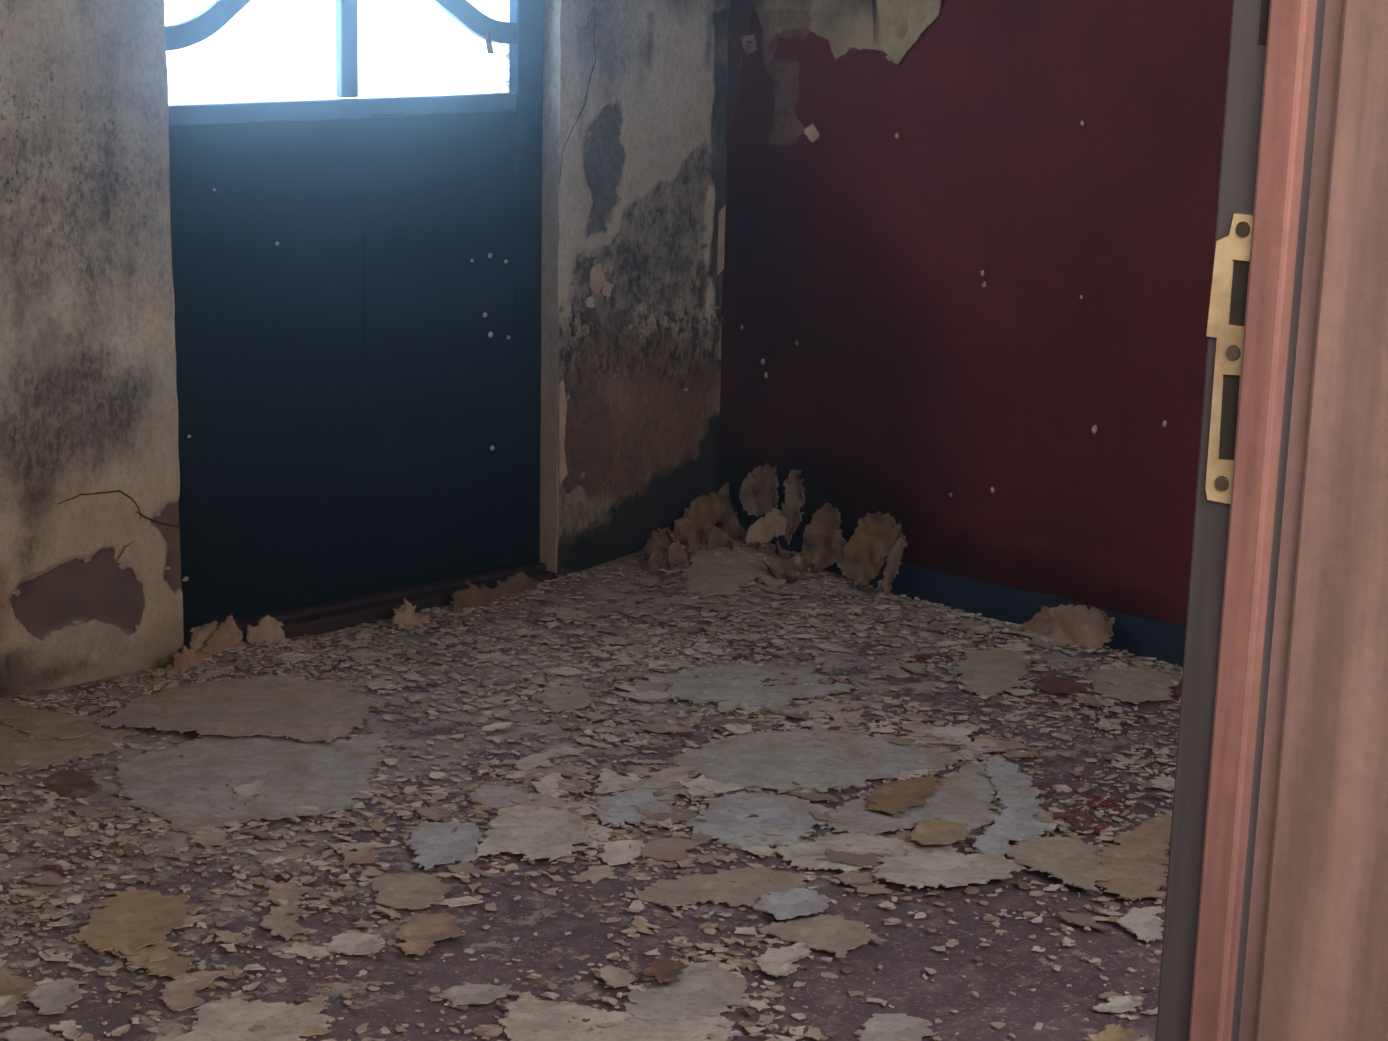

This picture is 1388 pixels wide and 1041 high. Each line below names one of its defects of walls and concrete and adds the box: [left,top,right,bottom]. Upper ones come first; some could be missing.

leakage [1,354,146,498]
peeling [559,379,568,485]
leakage [557,306,858,576]
spalling [10,547,145,640]
crack [58,490,181,559]
spalling [151,502,189,593]